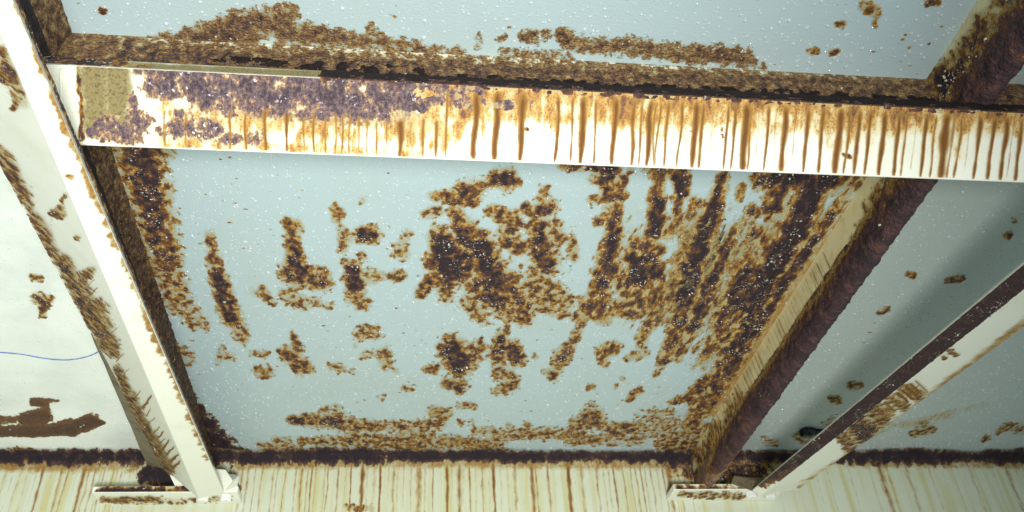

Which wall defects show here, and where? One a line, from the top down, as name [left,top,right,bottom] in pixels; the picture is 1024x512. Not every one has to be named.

corrosion [859,0,882,29]
corrosion [0,46,25,112]
corrosion [49,89,104,215]
corrosion [734,182,747,203]
corrosion [254,202,414,317]
corrosion [0,145,219,512]
corrosion [198,233,316,380]
corrosion [326,323,396,375]
corrosion [593,340,625,368]
corrosion [618,386,645,405]
corrosion [896,322,1024,406]
corrosion [677,491,745,500]